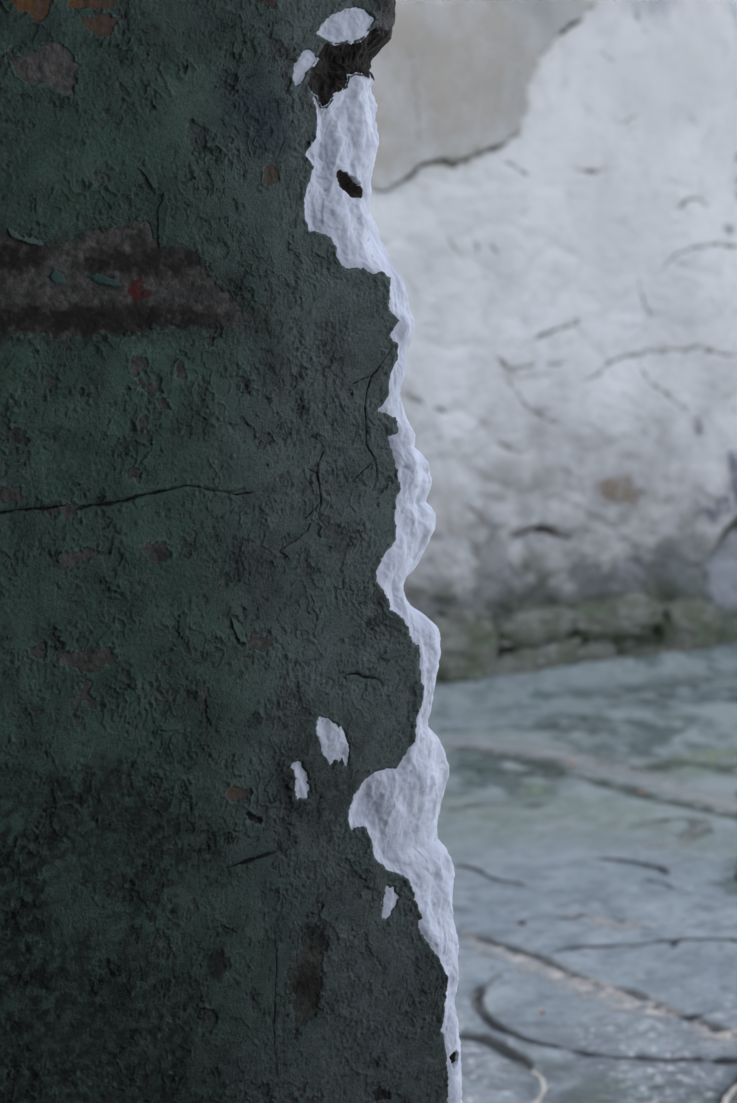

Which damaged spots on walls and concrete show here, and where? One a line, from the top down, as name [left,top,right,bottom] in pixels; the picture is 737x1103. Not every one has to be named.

peeling [10,0,53,22]
peeling [6,41,79,97]
peeling [0,221,254,339]
crack [353,355,387,480]
crack [499,319,578,422]
crack [591,345,729,412]
crack [0,485,251,514]
crack [305,439,324,519]
flaking render [291,0,463,1103]
peeling [286,919,329,1040]